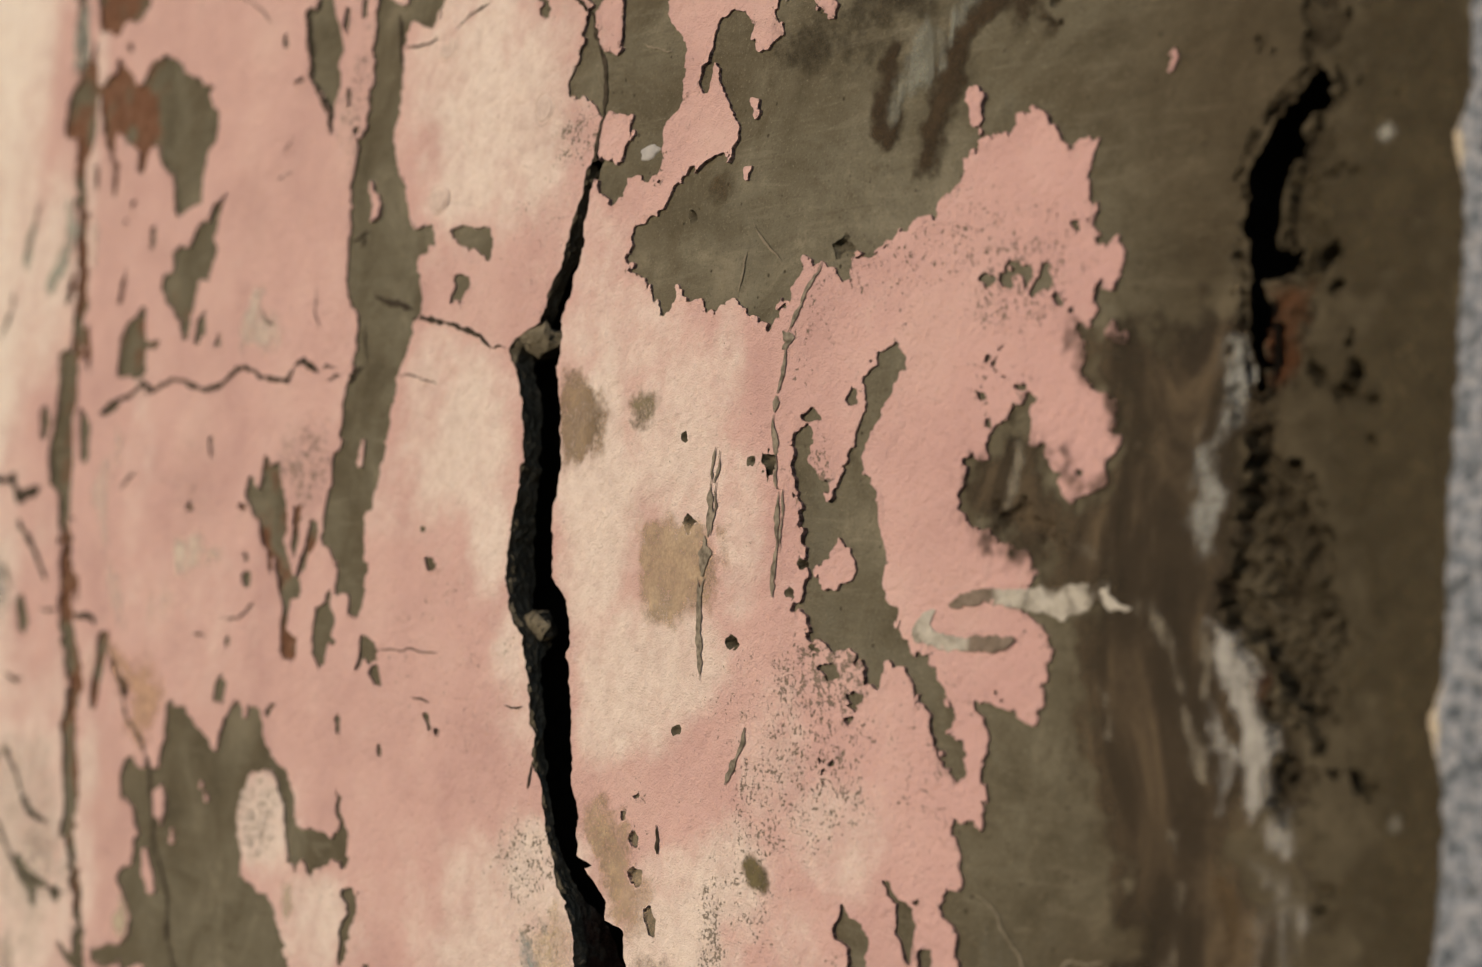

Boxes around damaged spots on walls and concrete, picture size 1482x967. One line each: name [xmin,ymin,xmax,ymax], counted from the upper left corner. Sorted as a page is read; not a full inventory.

crack [0,472,175,967]
peeling [14,0,349,967]
peeling [241,0,445,668]
peeling [339,887,356,965]
crack [99,0,626,967]
peeling [356,635,381,686]
peeling [452,274,471,303]
peeling [453,225,493,261]
peeling [541,0,551,18]
crack [652,825,660,854]
peeling [570,0,1473,967]
leakage [965,0,1471,967]